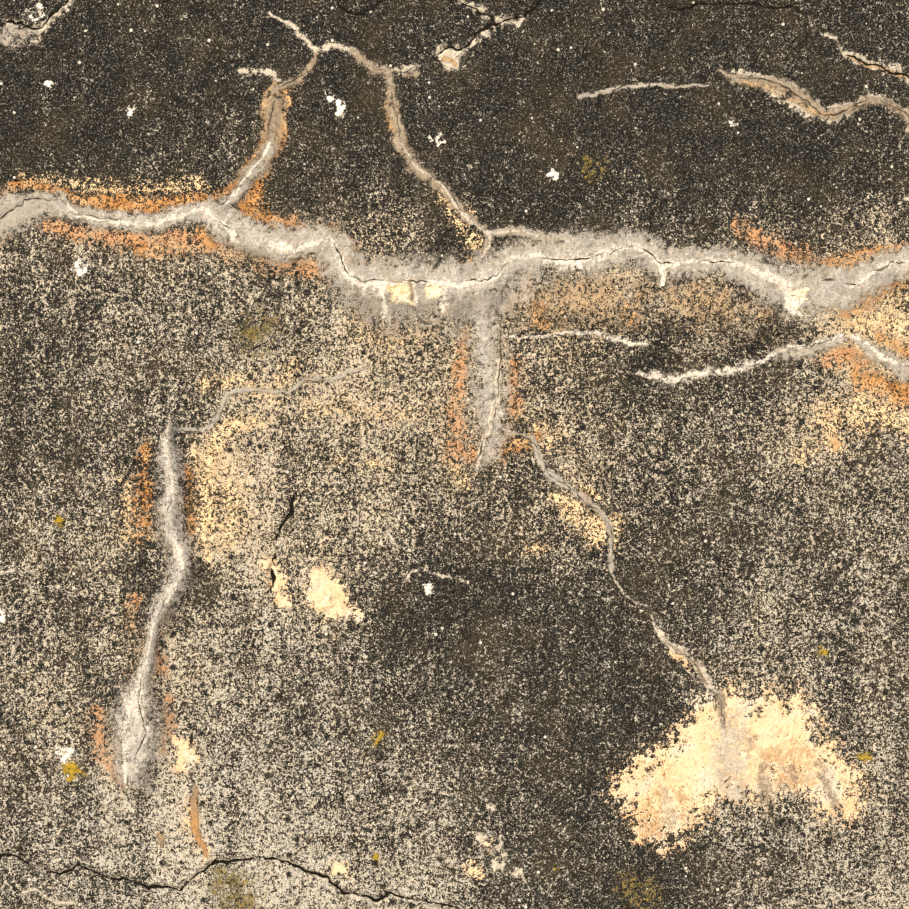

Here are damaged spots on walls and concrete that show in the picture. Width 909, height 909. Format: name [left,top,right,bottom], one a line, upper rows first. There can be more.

crack [0,0,73,48]
crack [337,0,385,16]
crack [434,0,542,60]
corrosion [0,116,358,252]
corrosion [38,217,335,289]
corrosion [730,215,908,271]
crack [0,12,909,728]
corrosion [789,278,909,466]
spalling [259,557,367,622]
spalling [599,675,873,860]
crack [0,853,460,909]